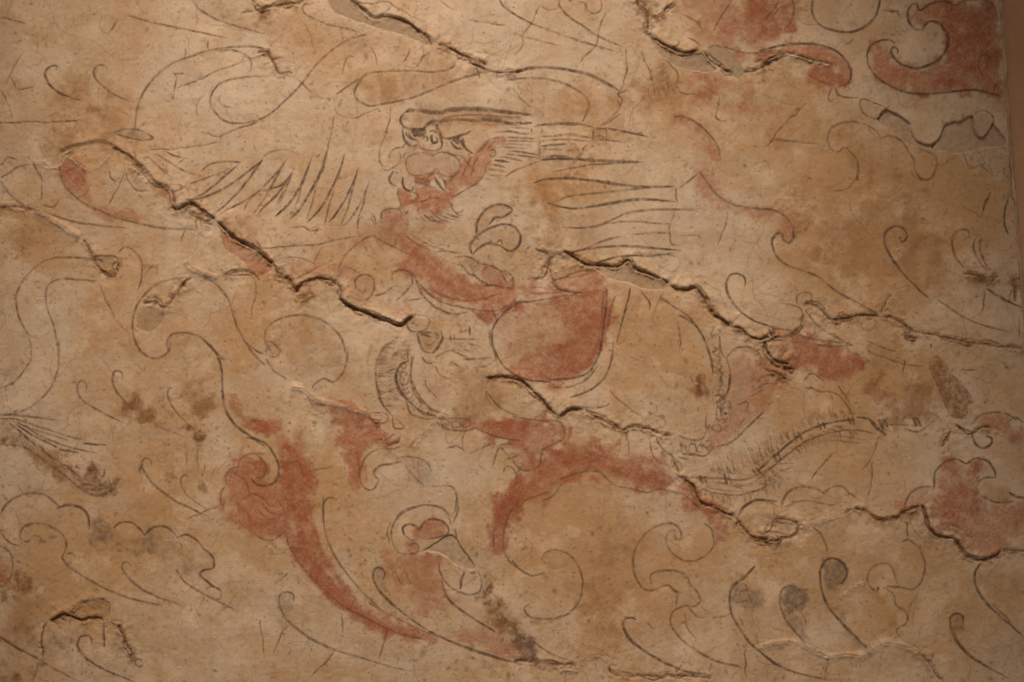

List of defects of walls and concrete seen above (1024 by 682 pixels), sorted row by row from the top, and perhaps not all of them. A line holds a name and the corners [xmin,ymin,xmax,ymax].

crack [351,0,523,75]
crack [637,0,829,73]
flaking render [860,99,1007,154]
crack [0,205,120,277]
crack [34,147,414,327]
crack [533,249,1022,380]
crack [486,376,671,437]
crack [941,425,1004,446]
crack [674,462,1024,562]